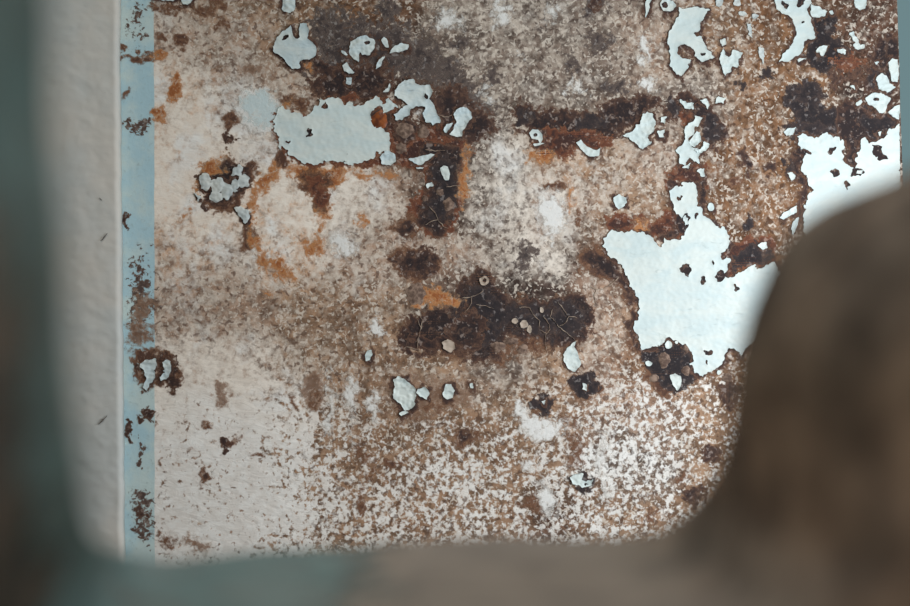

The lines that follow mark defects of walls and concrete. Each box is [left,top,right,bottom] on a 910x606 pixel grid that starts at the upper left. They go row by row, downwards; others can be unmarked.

corrosion [126,244,184,396]
peeling [0,0,391,606]
peeling [270,75,476,192]
corrosion [179,0,730,369]
leakage [436,8,474,78]
leakage [479,64,503,103]
leakage [490,0,513,31]
corrosion [577,242,698,399]
leakage [637,35,651,66]
peeling [602,95,768,391]
peeling [779,55,900,232]
corrosion [124,406,156,470]